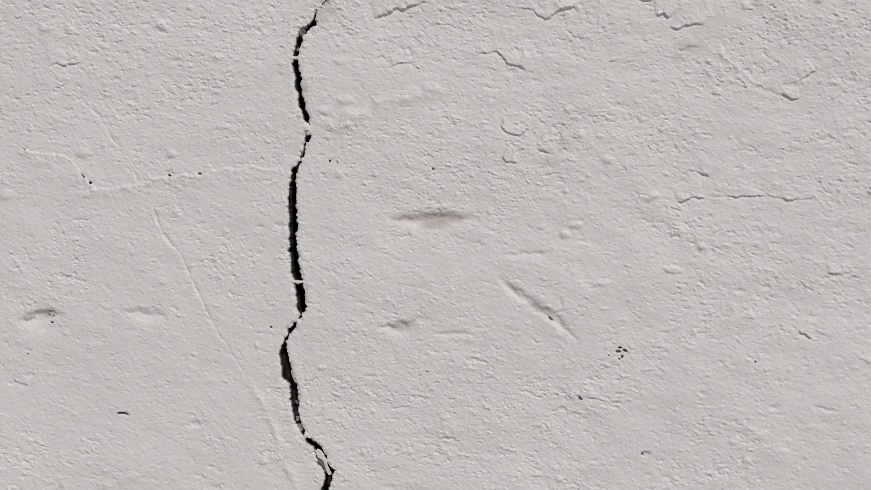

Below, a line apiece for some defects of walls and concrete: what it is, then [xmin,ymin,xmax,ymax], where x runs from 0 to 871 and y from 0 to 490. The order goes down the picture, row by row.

crack [21,0,336,490]